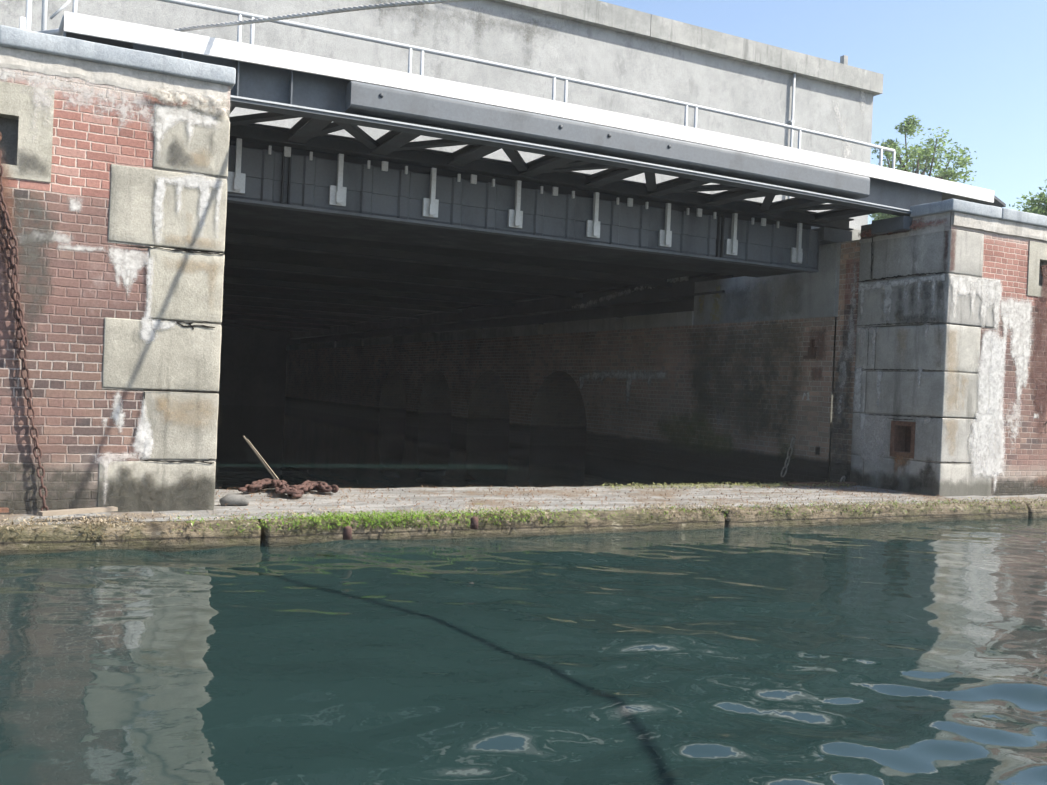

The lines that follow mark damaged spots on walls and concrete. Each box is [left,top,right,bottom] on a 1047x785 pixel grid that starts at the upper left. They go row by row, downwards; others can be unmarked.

water stain [0,68,223,242]
water stain [13,197,153,302]
water stain [141,300,174,341]
crack [152,319,220,330]
water stain [830,270,1047,485]